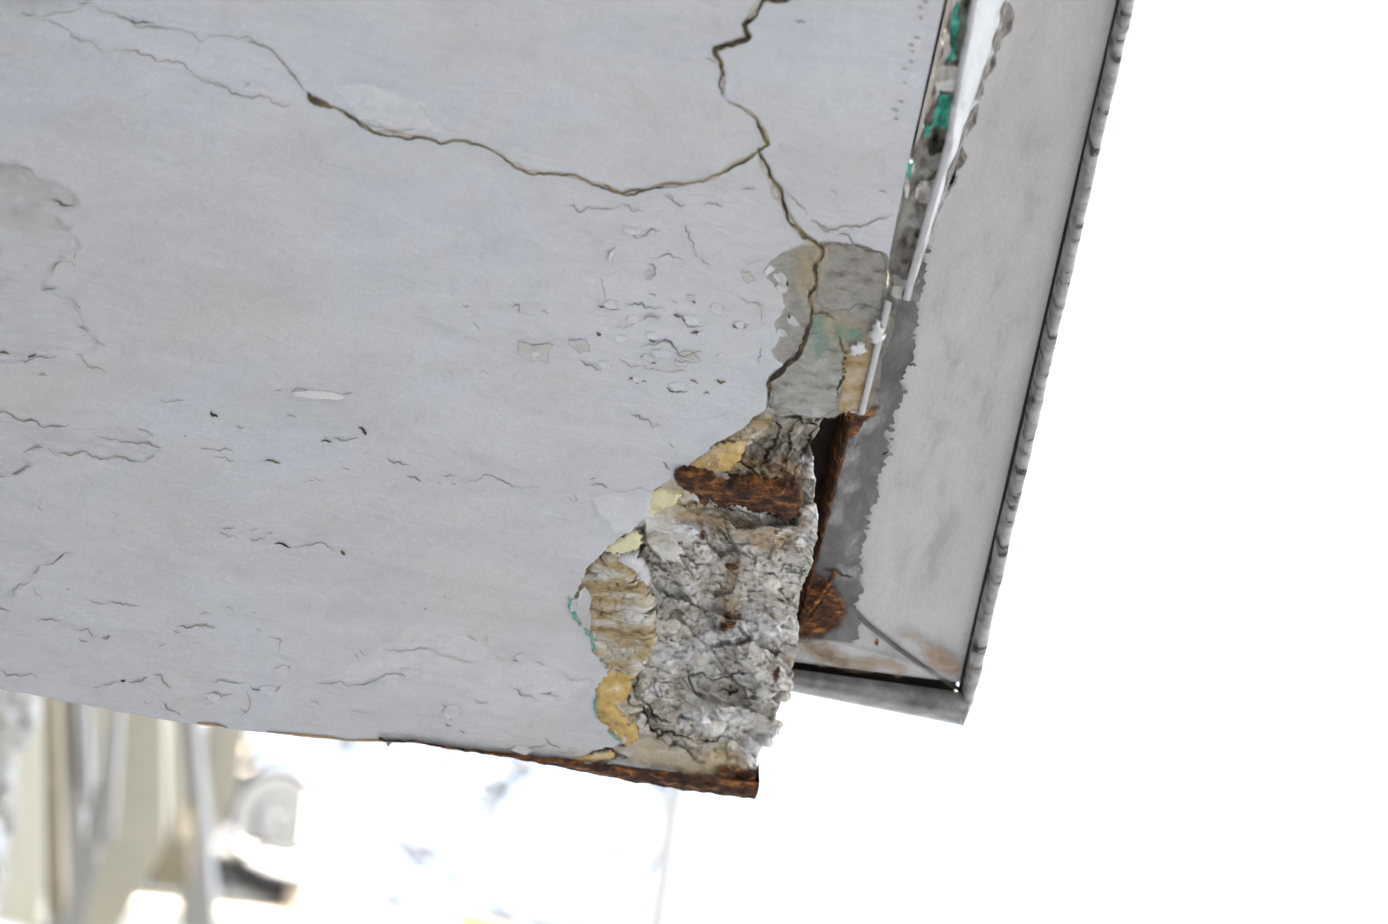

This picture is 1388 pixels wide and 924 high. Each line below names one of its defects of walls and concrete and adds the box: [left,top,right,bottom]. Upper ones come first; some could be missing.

crack [0,0,891,402]
spalling [319,0,971,777]
peeling [221,528,345,555]
corrosion [796,407,900,669]
corrosion [714,762,758,782]